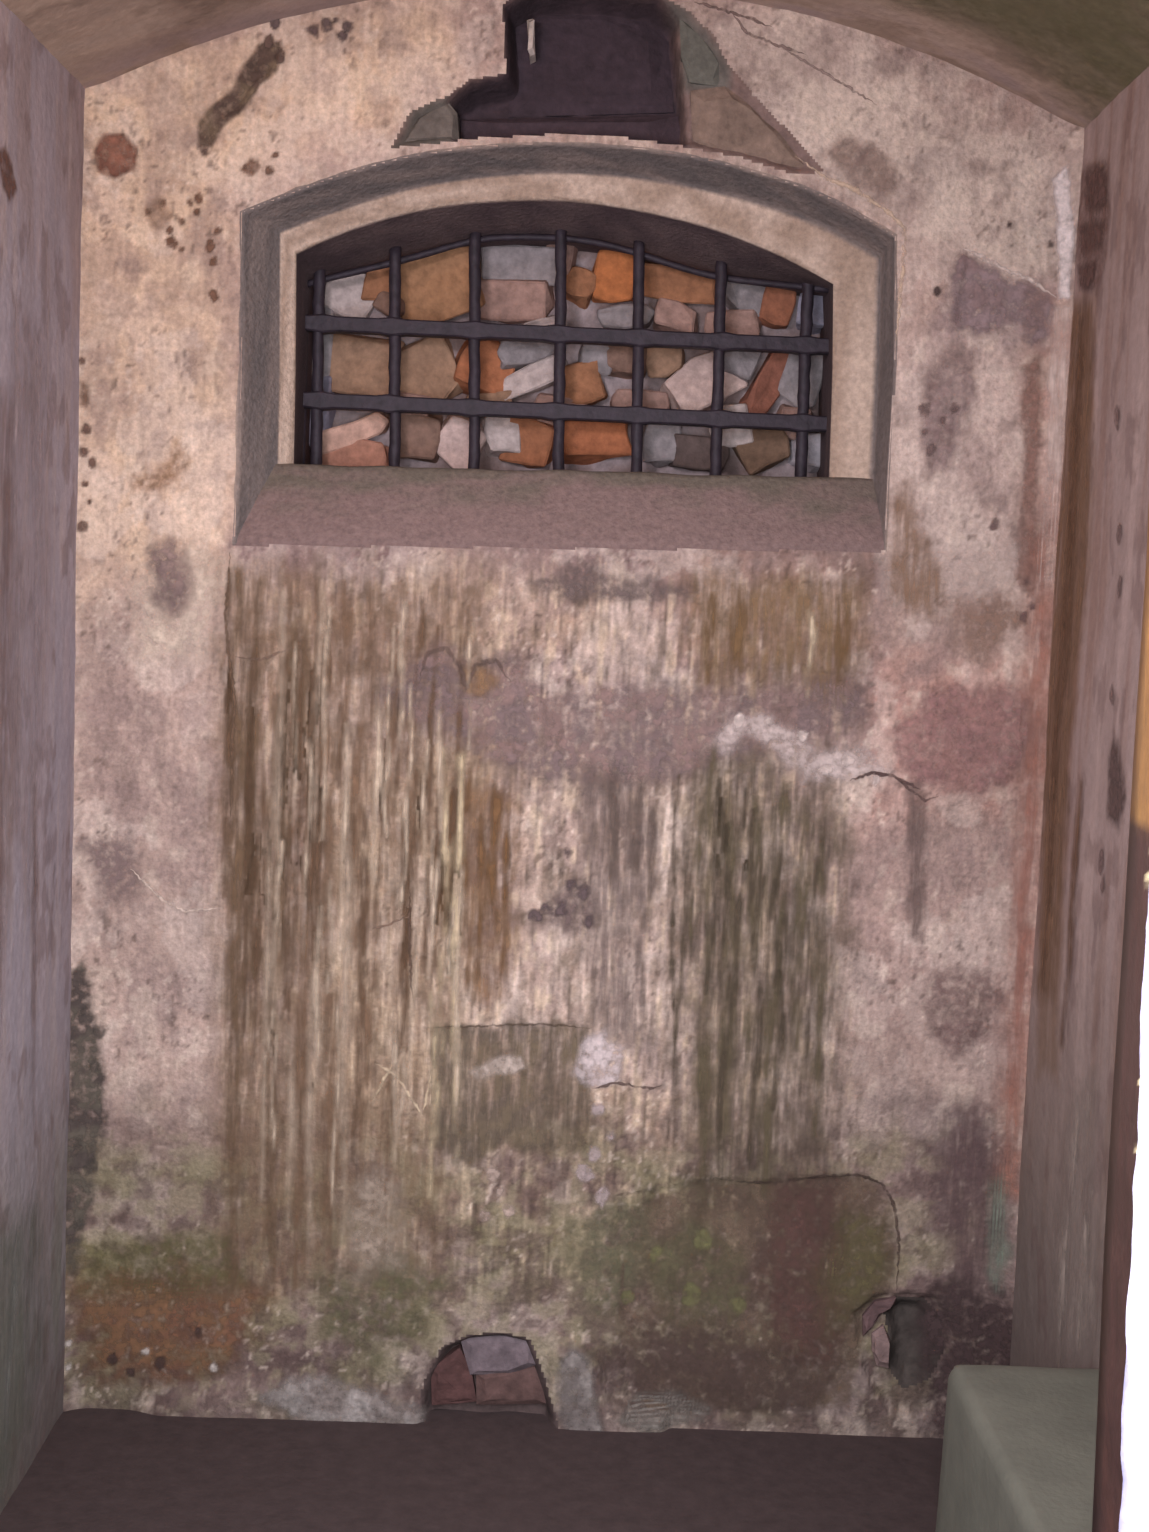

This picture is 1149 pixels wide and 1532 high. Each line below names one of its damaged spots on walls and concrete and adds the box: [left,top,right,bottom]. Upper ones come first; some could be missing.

spalling [391,0,905,341]
water stain [888,499,1018,609]
water stain [139,543,884,1240]
water stain [934,976,1001,1051]
water stain [352,1179,396,1266]
spalling [417,1332,558,1428]